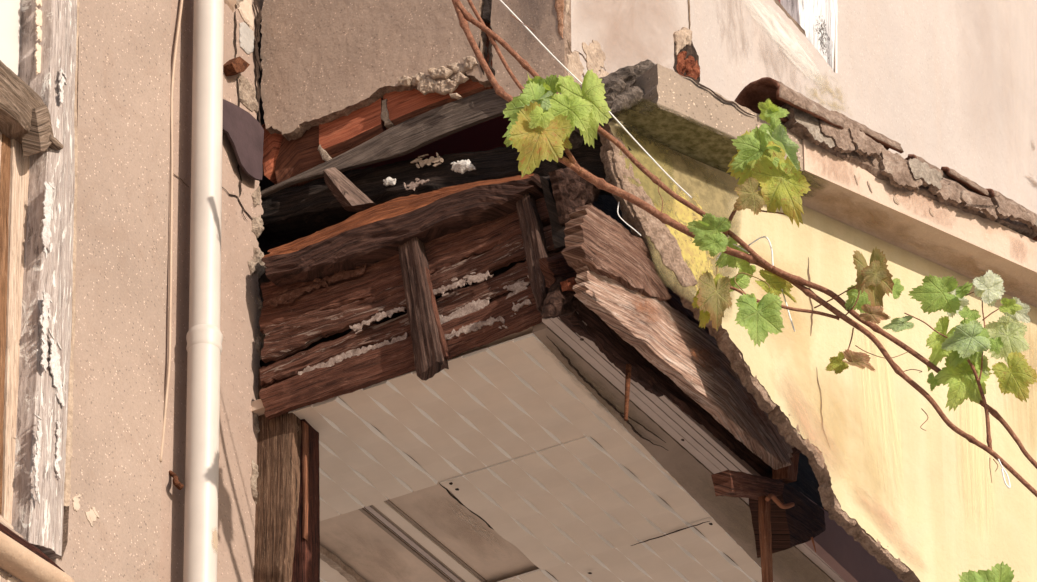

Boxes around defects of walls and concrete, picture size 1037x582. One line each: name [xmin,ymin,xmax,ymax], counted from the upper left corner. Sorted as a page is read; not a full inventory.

peeling [58,68,67,104]
crack [234,0,262,124]
flaking render [397,56,479,100]
peeling [41,181,55,259]
crack [222,164,253,220]
peeling [39,291,65,407]
peeling [33,414,62,504]